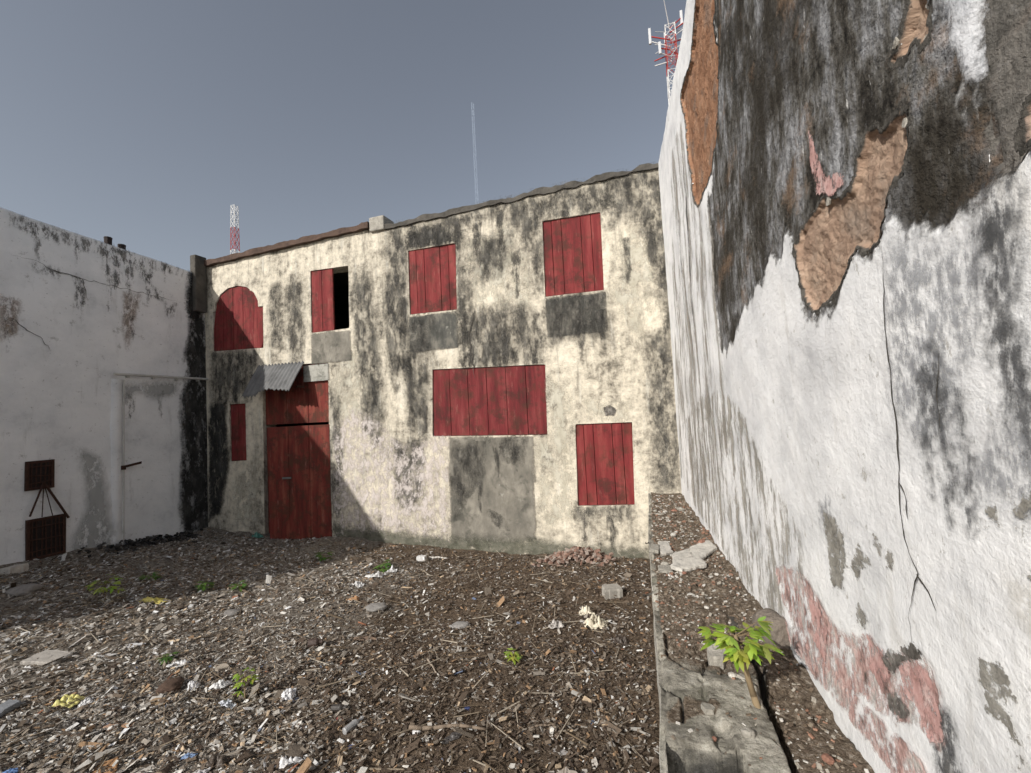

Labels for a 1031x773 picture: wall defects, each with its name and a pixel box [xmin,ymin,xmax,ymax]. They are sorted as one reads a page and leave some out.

peeling [975,0,1031,178]
crack [13,255,169,300]
damp [12,217,257,532]
damp [269,279,305,361]
damp [330,395,649,559]
damp [350,171,667,508]
damp [645,306,679,489]
peeling [671,0,946,773]
damp [707,0,1031,528]
crack [881,250,936,643]